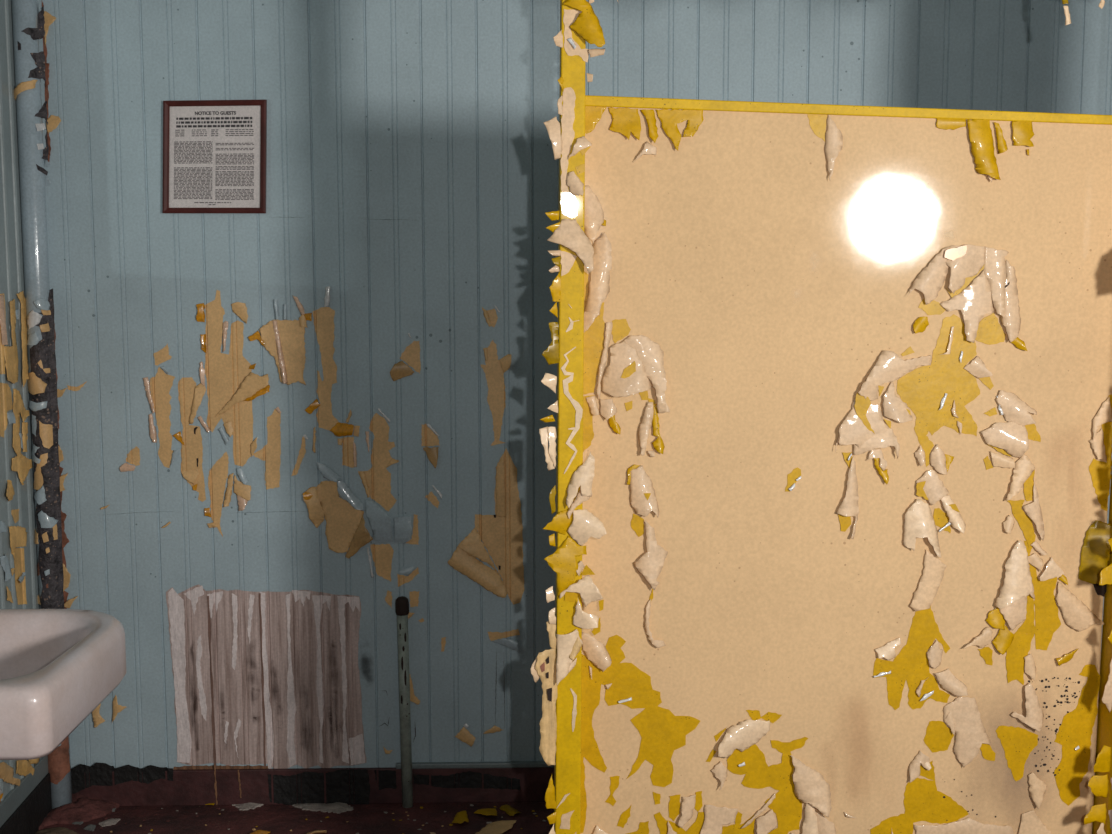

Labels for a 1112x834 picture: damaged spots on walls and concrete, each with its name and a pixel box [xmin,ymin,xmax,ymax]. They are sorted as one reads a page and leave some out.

peeling [42,2,61,187]
peeling [553,0,605,82]
peeling [936,118,1035,182]
peeling [1062,0,1071,26]
peeling [0,291,32,605]
peeling [58,444,78,609]
peeling [120,446,140,472]
peeling [143,286,424,622]
peeling [448,305,525,605]
peeling [531,73,856,834]
peeling [835,244,1112,834]
peeling [474,808,517,834]